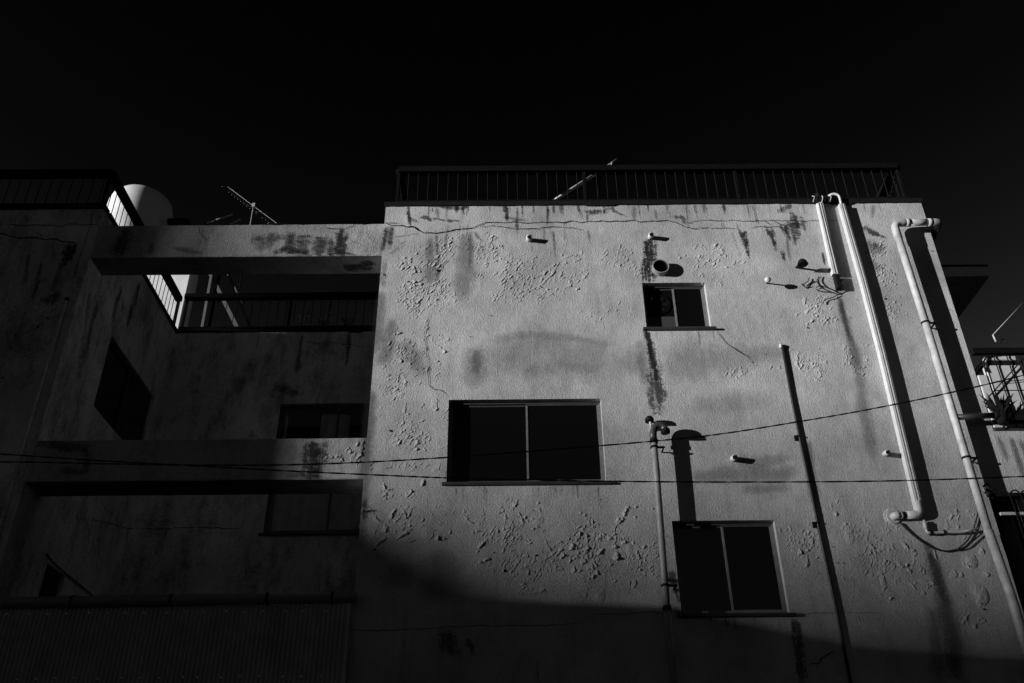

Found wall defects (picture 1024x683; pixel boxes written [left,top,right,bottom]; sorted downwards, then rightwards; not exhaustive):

leakage [273,229,375,272]
crack [329,205,833,252]
leakage [641,238,657,282]
leakage [766,204,805,260]
peeling [324,228,621,558]
leakage [643,331,666,414]
peeling [536,498,661,601]